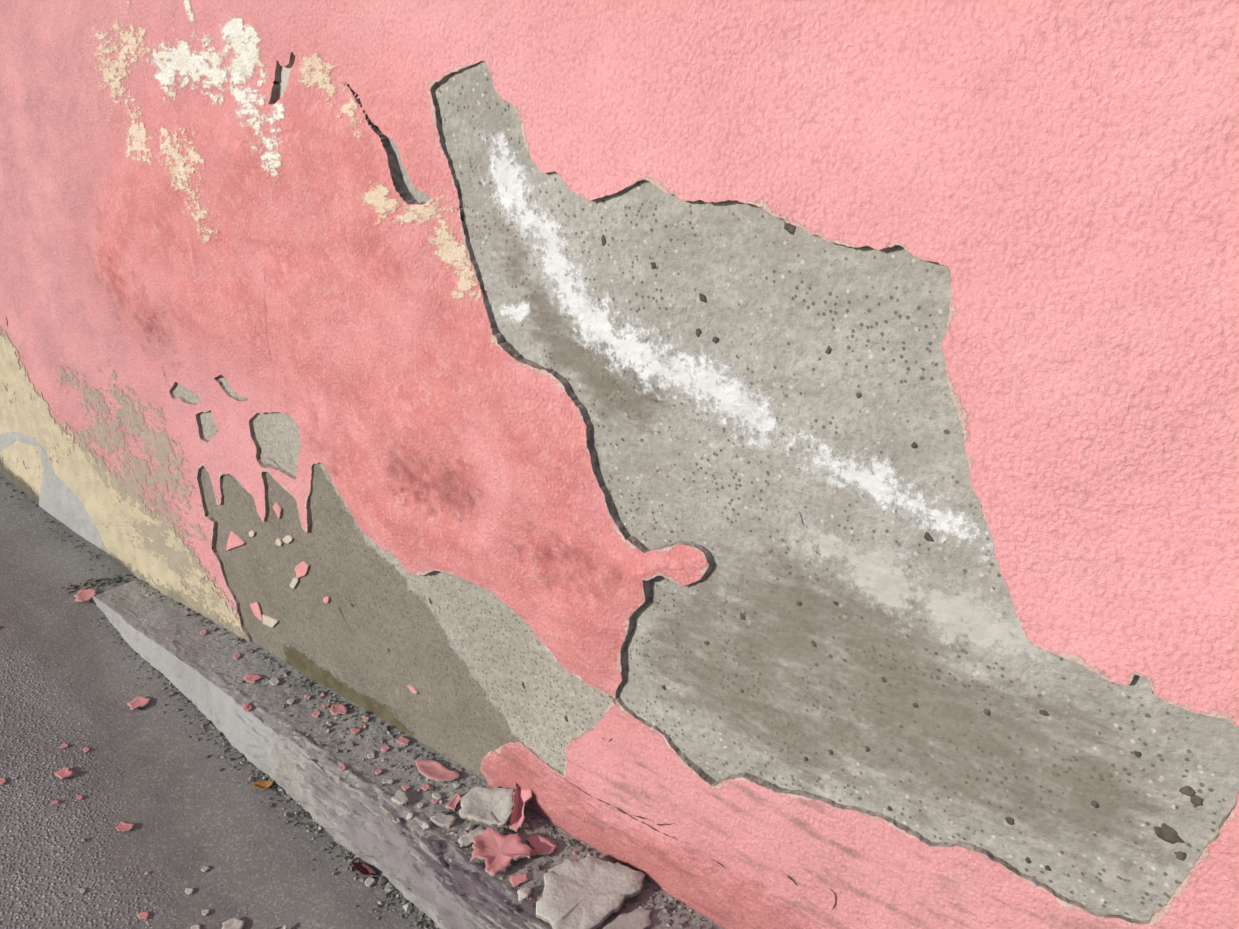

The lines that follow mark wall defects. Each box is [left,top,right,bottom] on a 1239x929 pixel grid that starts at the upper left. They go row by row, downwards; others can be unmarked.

peeling [94,0,362,243]
peeling [358,184,399,224]
crack [344,83,432,205]
damp [481,132,993,562]
flaking render [0,327,616,781]
spalling [395,61,1239,929]
damp [789,515,1057,663]
peeling [115,822,135,832]
peeling [295,764,532,929]